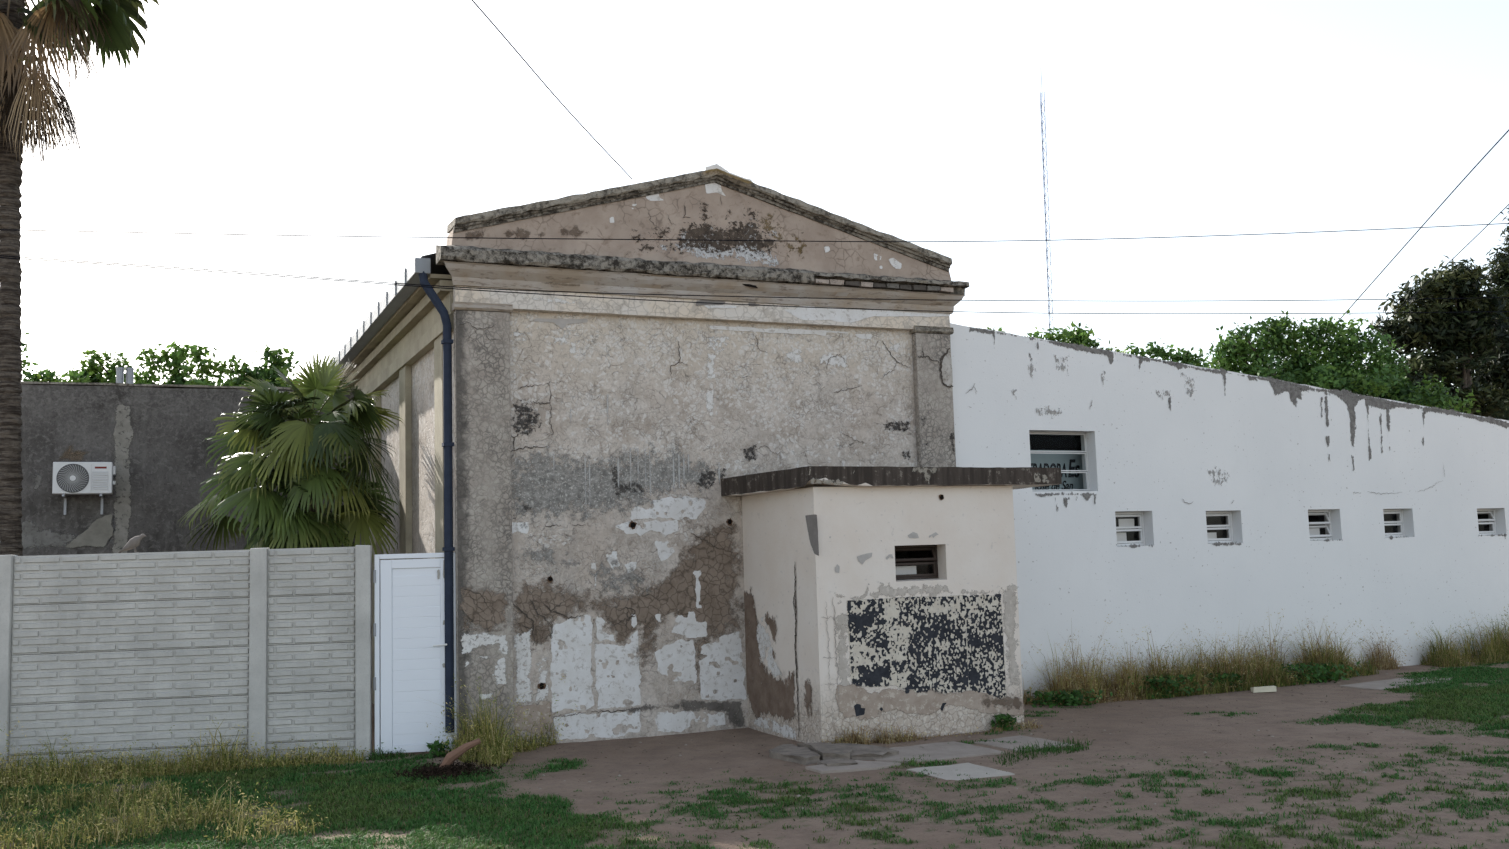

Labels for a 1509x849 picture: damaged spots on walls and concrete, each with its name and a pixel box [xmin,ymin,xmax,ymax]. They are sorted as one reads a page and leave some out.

water stain [511,400,726,525]
peeling [512,522,529,534]
peeling [615,496,706,561]
peeling [591,551,637,586]
peeling [461,570,782,740]
peeling [833,582,1021,716]
peeling [754,717,796,740]